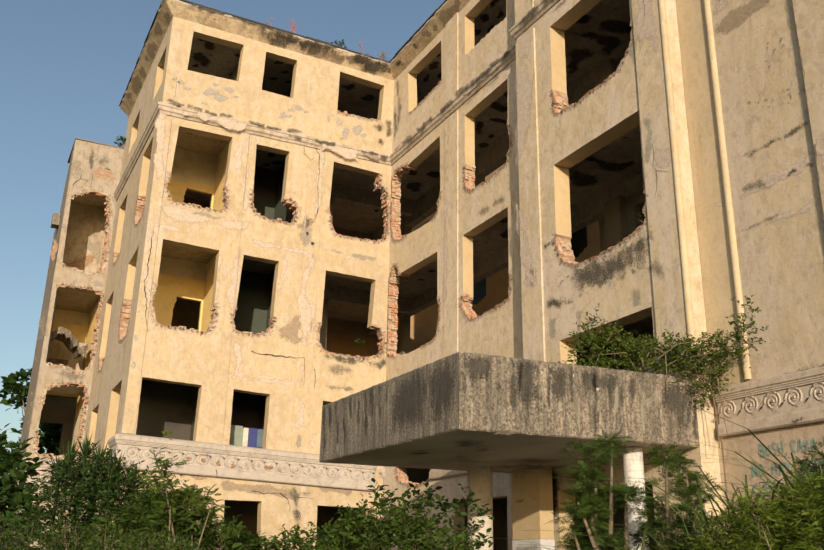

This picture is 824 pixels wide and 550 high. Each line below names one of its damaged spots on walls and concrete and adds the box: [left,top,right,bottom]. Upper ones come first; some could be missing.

flaking render [192,38,215,68]
water stain [191,3,337,57]
water stain [347,53,403,75]
water stain [440,49,510,112]
peeling [714,0,769,34]
peeling [741,139,824,199]
crack [144,227,154,329]
peeling [118,83,440,379]
water stain [572,231,664,291]
crack [251,351,316,388]
water stain [322,354,501,455]
water stain [499,362,698,440]